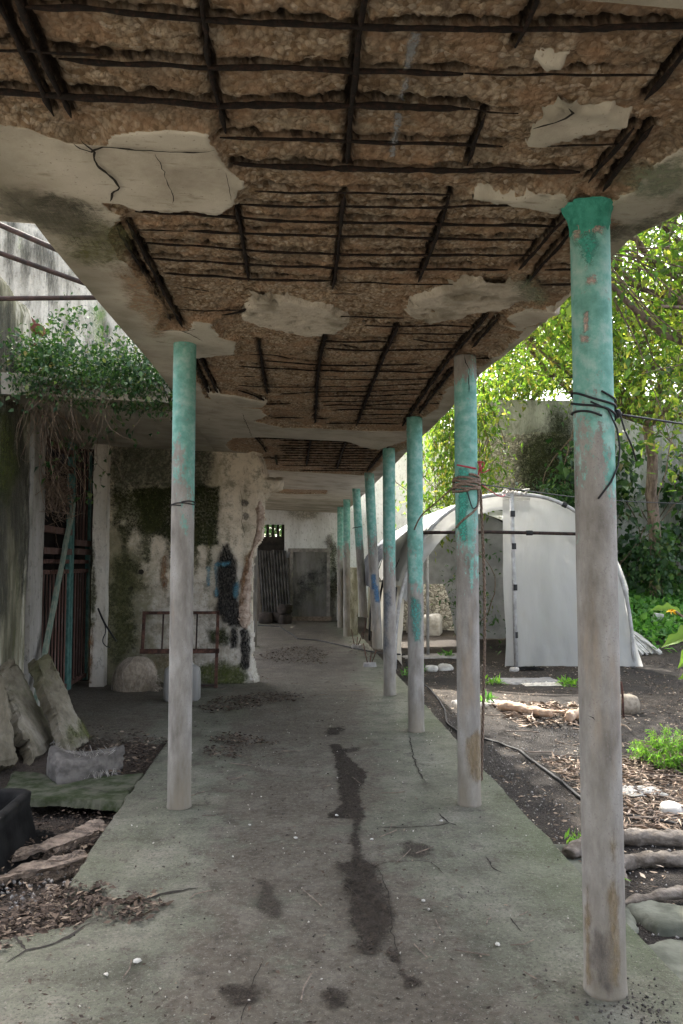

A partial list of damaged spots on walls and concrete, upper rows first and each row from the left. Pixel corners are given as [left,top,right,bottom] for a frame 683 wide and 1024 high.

crack [74,139,214,202]
crack [534,109,575,129]
spalling [0,0,683,475]
leakage [107,447,172,665]
leakage [194,451,220,573]
flaking render [238,501,265,630]
flaking render [484,432,574,502]
leakage [209,628,231,645]